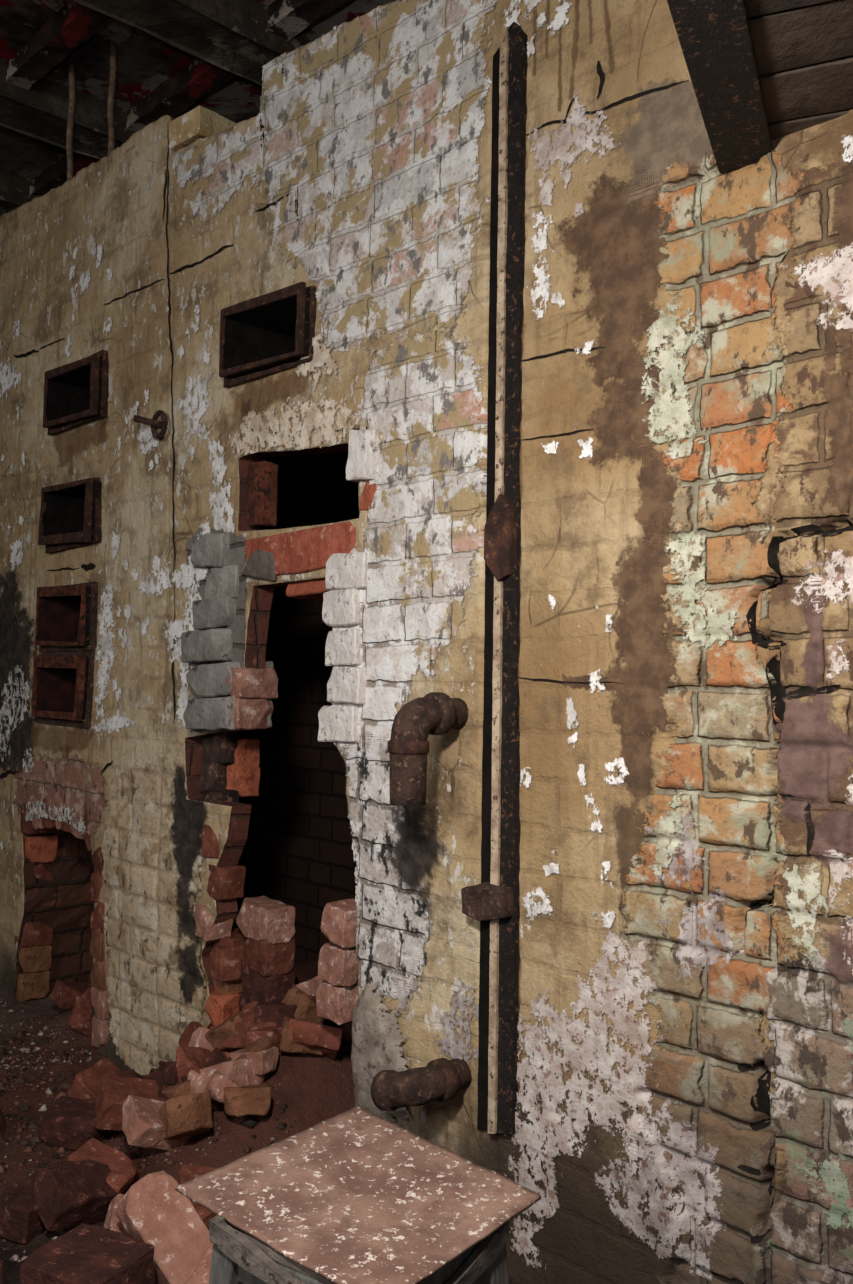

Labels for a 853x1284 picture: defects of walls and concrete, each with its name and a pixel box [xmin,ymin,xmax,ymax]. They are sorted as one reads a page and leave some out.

peeling [65,242,112,357]
peeling [524,93,621,320]
damp [0,564,24,650]
crack [102,123,233,719]
peeling [89,0,572,1012]
damp [555,80,719,916]
spalling [504,135,853,1284]
crack [746,519,853,758]
peeling [435,981,479,1064]